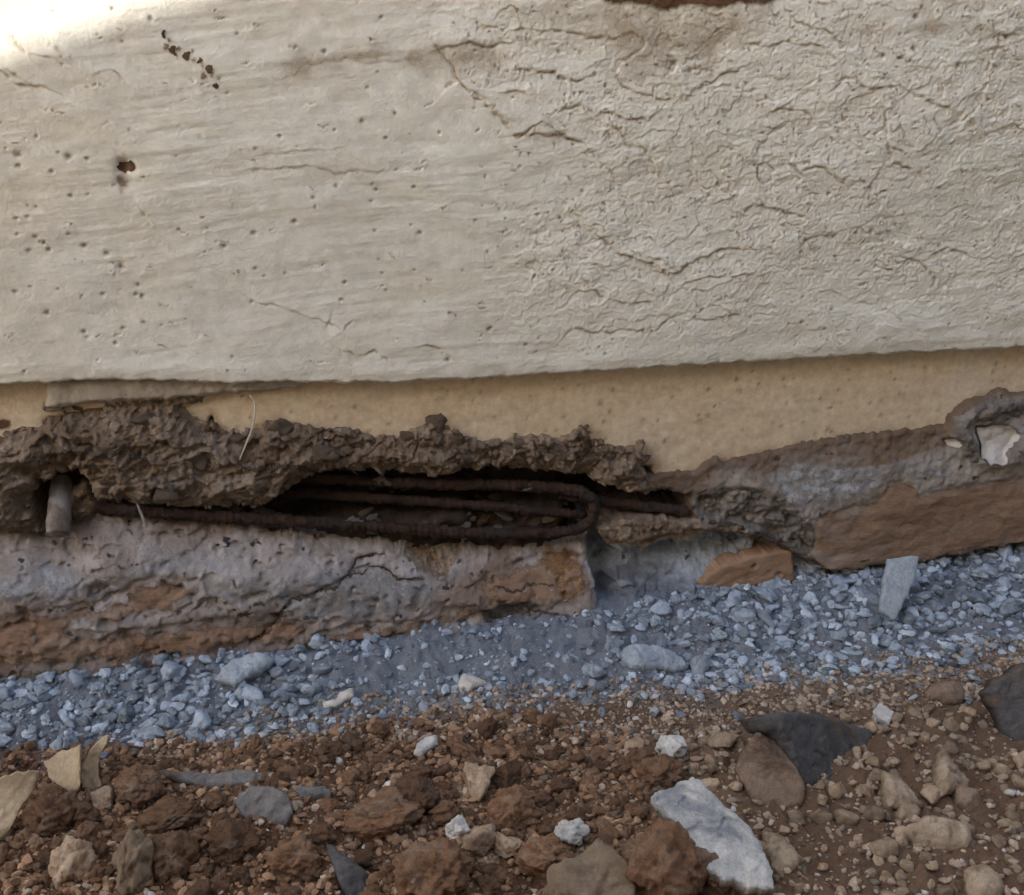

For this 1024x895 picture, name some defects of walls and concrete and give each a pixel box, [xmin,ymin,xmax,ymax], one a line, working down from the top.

spalling [0,393,651,533]
spalling [945,396,1024,466]
peeling [0,580,304,665]
crack [249,553,423,645]
peeling [333,477,1024,642]